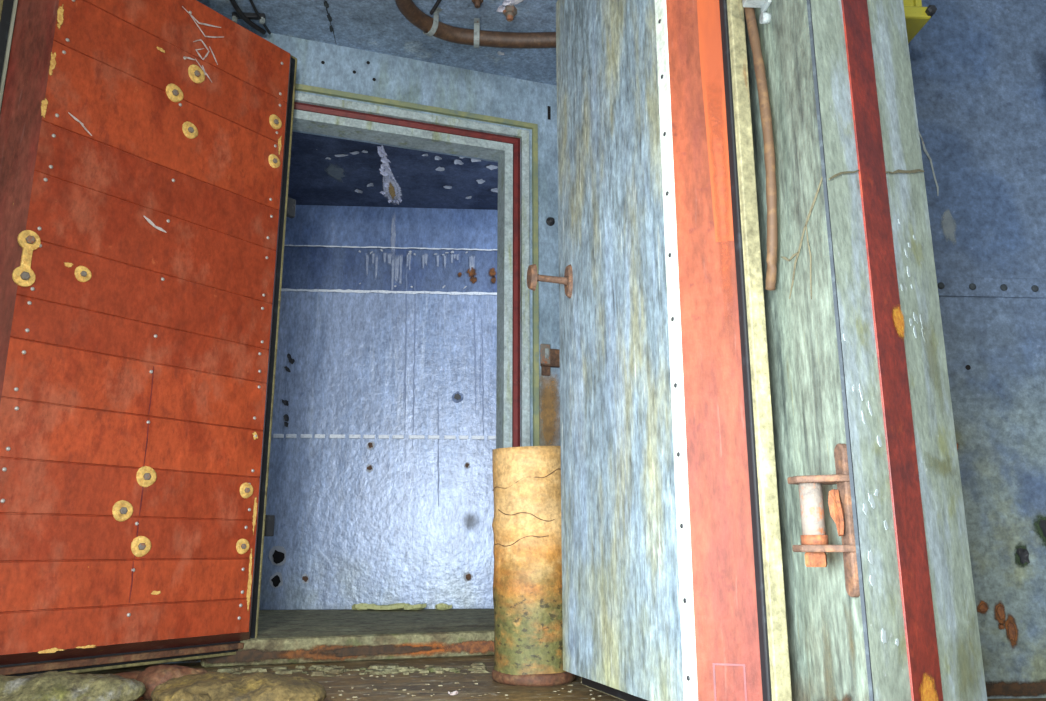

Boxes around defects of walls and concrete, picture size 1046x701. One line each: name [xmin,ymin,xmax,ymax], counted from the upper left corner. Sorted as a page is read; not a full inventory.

rust [977,601,1018,648]
rust [183,640,494,664]